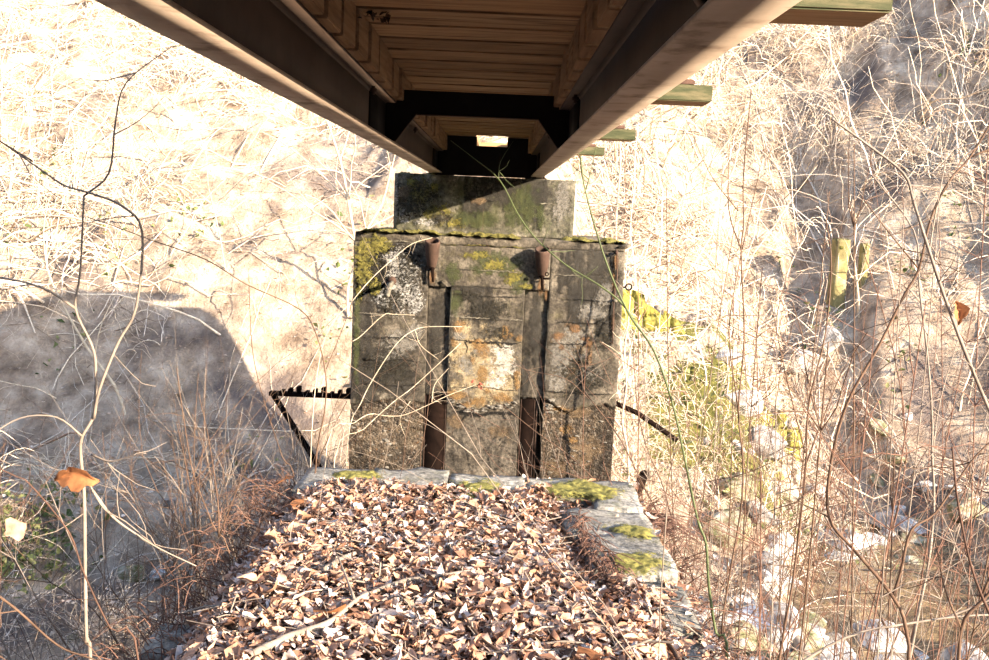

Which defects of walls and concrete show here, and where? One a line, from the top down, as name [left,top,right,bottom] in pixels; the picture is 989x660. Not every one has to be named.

water stain [394,173,438,226]
peeling [370,244,427,322]
water stain [351,238,621,406]
rust [447,339,522,476]